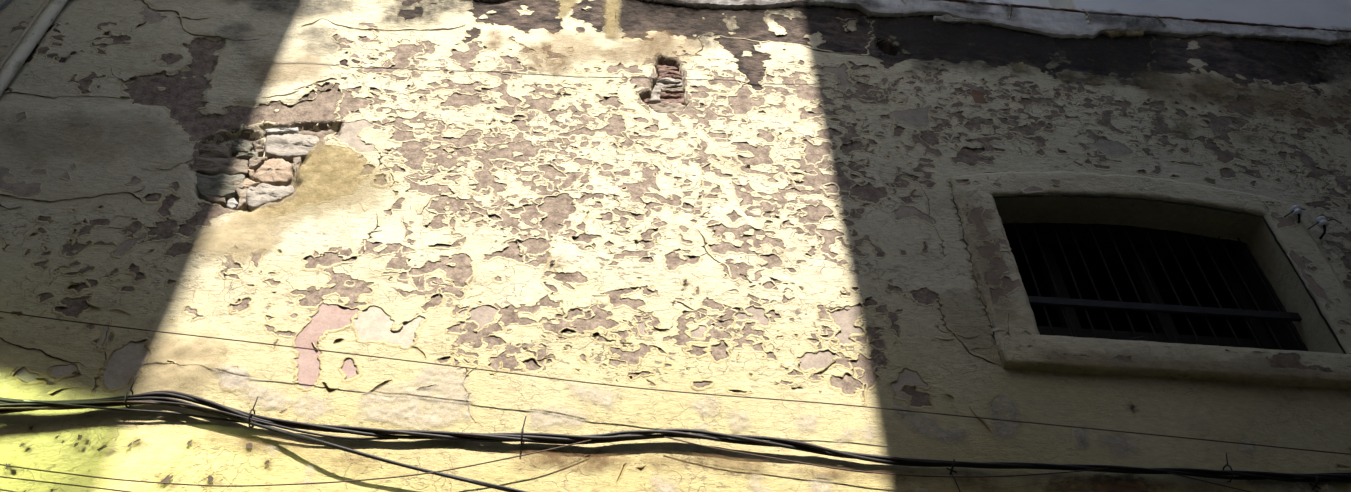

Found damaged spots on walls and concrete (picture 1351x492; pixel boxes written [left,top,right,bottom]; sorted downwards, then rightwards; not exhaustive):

water stain [560,0,575,15]
water stain [602,0,1167,89]
water stain [1233,25,1351,100]
peeling [361,264,672,426]
peeling [773,296,904,406]
peeling [10,363,82,387]
peeling [690,379,716,391]
peeling [726,371,756,396]
peeling [887,366,935,410]